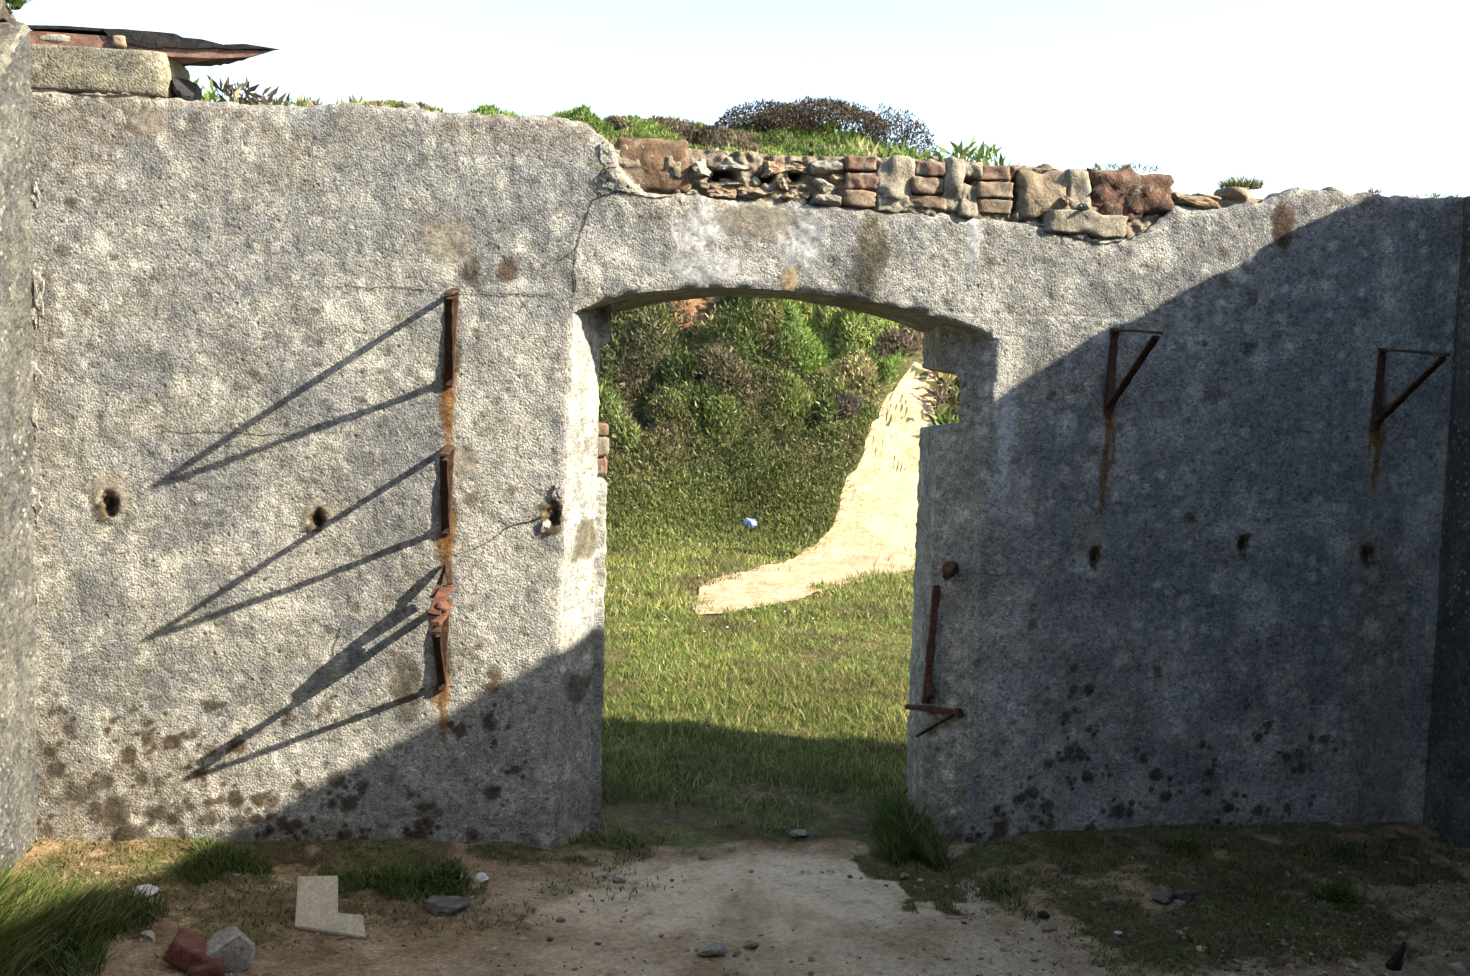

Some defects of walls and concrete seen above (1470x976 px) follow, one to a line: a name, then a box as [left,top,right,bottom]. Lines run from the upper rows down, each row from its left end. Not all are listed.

crack [460,165,672,313]
water stain [1271,203,1296,249]
crack [455,517,543,565]